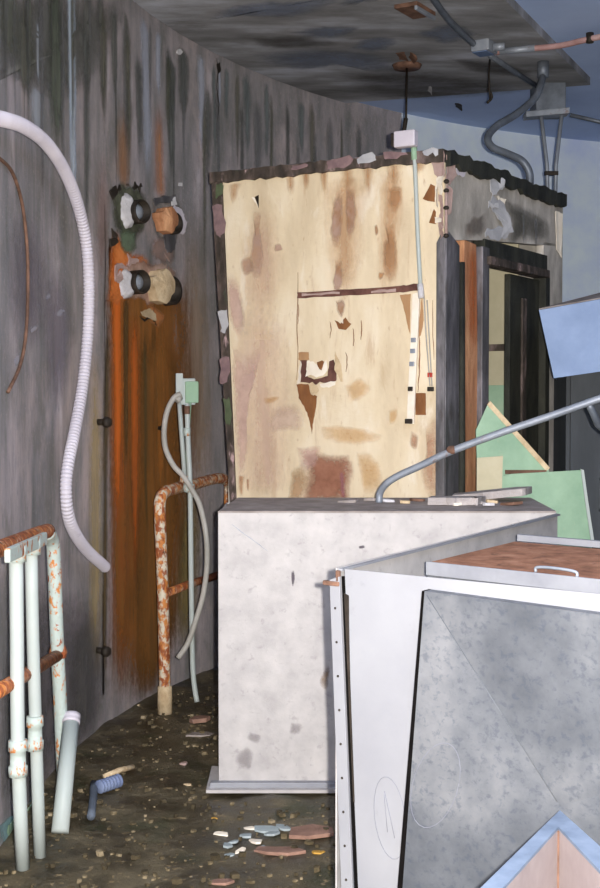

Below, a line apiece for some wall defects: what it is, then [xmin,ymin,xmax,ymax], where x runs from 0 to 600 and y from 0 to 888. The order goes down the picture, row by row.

water stain [0,0,188,195]
spalling [109,182,187,283]
water stain [332,170,355,290]
peeling [327,151,408,169]
water stain [375,166,400,278]
peeling [485,178,514,241]
peeling [555,211,563,258]
rust [103,240,195,689]
water stain [292,452,351,498]
water stain [39,610,50,658]
water stain [63,565,99,742]
water stain [40,667,56,777]